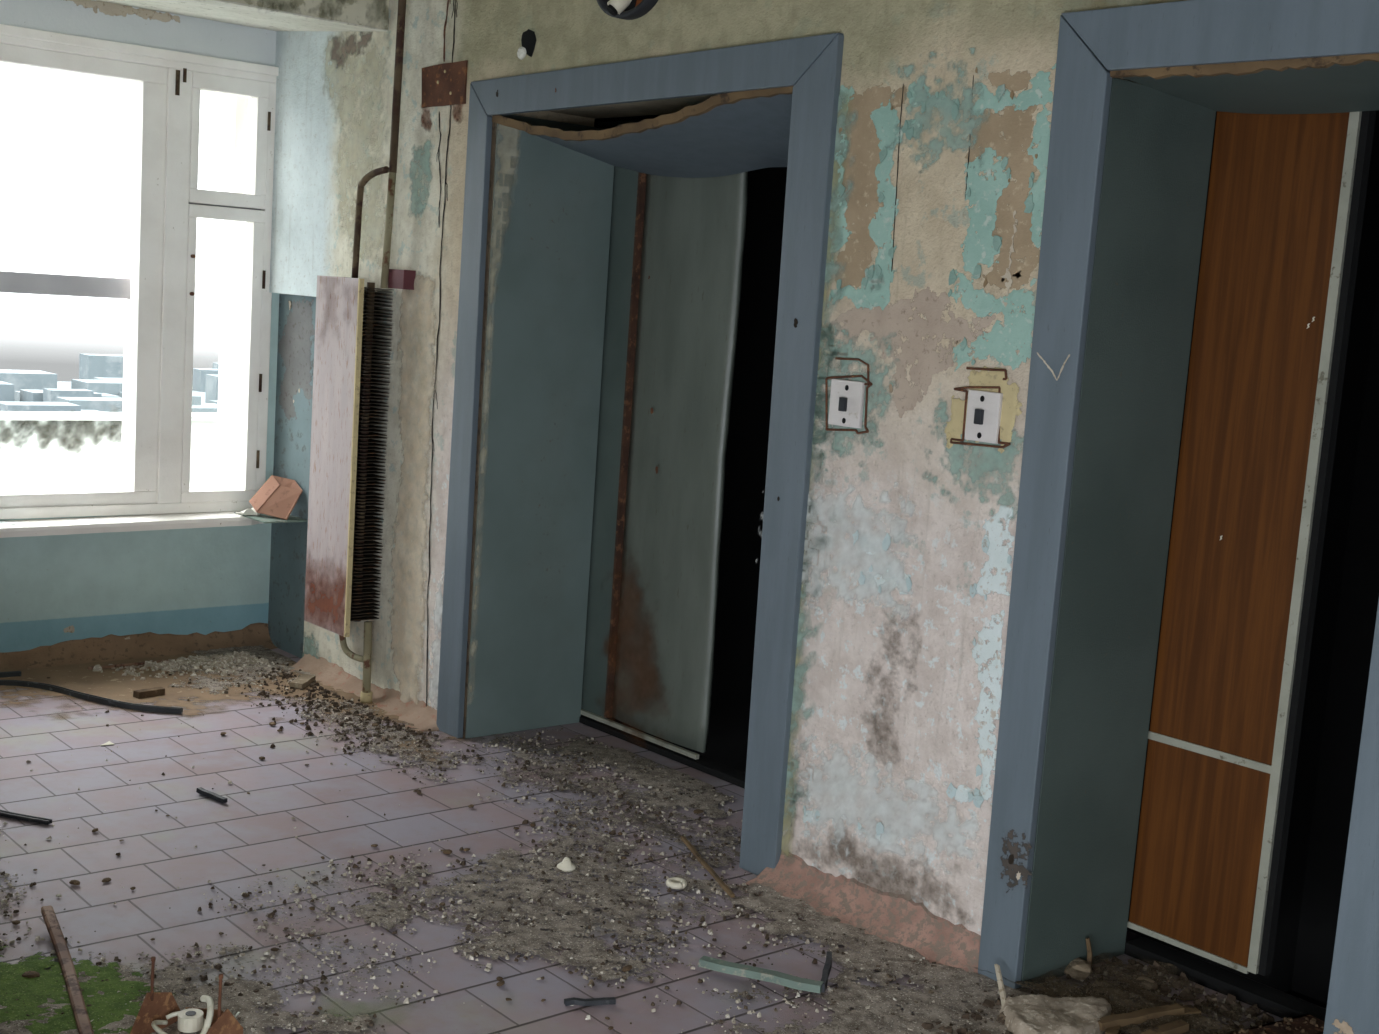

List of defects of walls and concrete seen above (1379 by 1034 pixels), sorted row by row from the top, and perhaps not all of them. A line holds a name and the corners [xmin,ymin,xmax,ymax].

rust [604,172,650,718]
damp [830,833,965,919]
spalling [1000,829,1033,893]